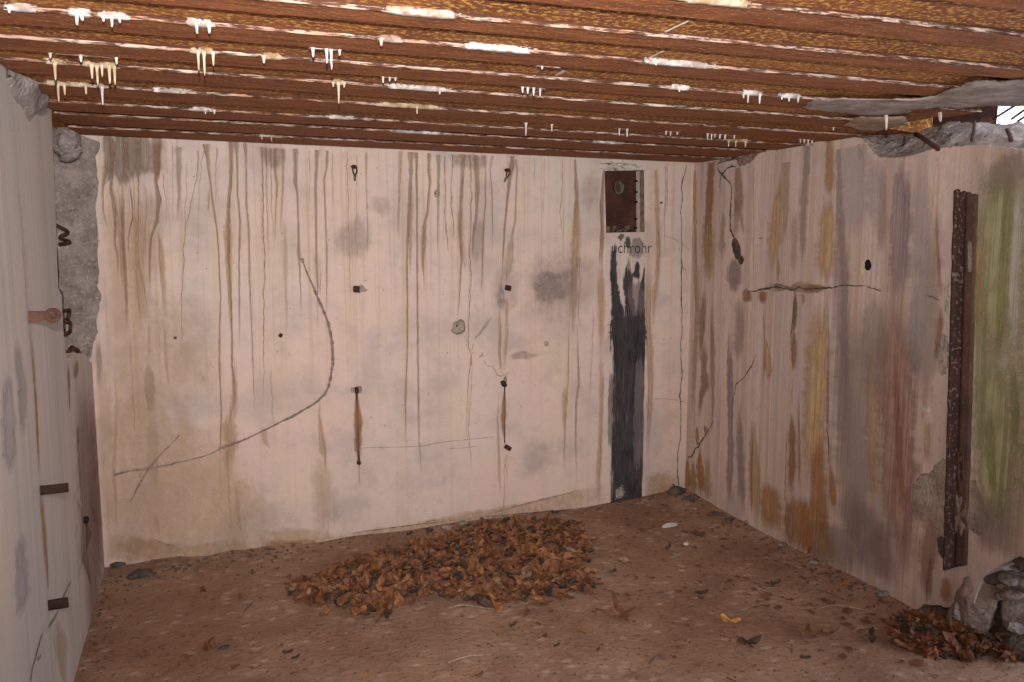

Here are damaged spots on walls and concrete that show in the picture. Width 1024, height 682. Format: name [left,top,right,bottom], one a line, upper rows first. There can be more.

damp [67,8,130,27]
damp [383,6,462,20]
damp [7,53,119,122]
damp [308,47,354,120]
damp [376,77,451,114]
damp [462,42,538,54]
damp [640,50,719,69]
spalling [902,106,1024,151]
crack [717,165,762,265]
spalling [53,134,101,360]
crack [747,285,881,338]
spalling [911,458,946,540]